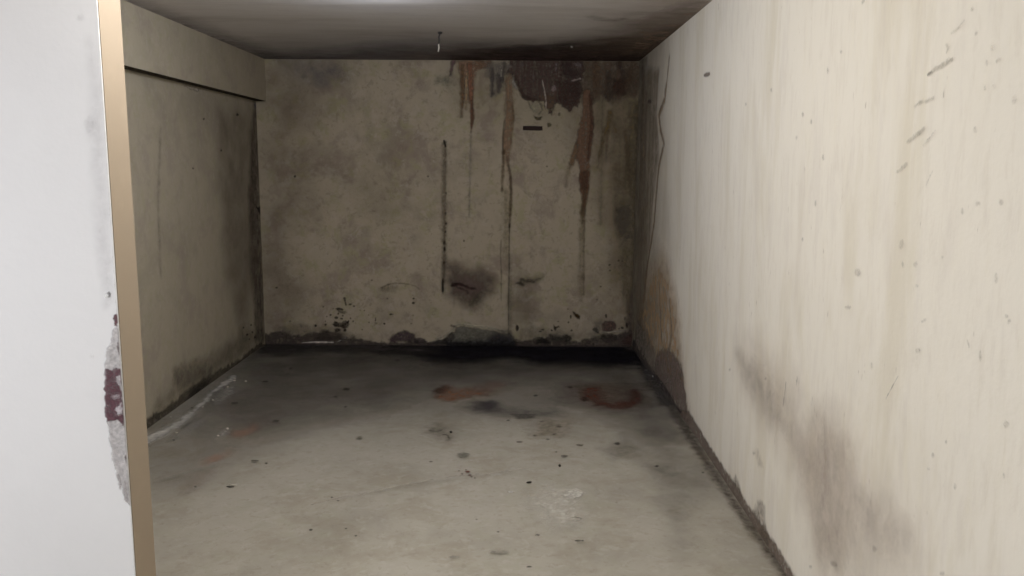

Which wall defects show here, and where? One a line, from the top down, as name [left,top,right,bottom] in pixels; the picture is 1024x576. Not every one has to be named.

corrosion [444,60,491,129]
corrosion [501,73,514,224]
peeling [507,61,585,127]
corrosion [569,89,612,223]
water stain [302,297,392,343]
flaking render [103,314,130,505]